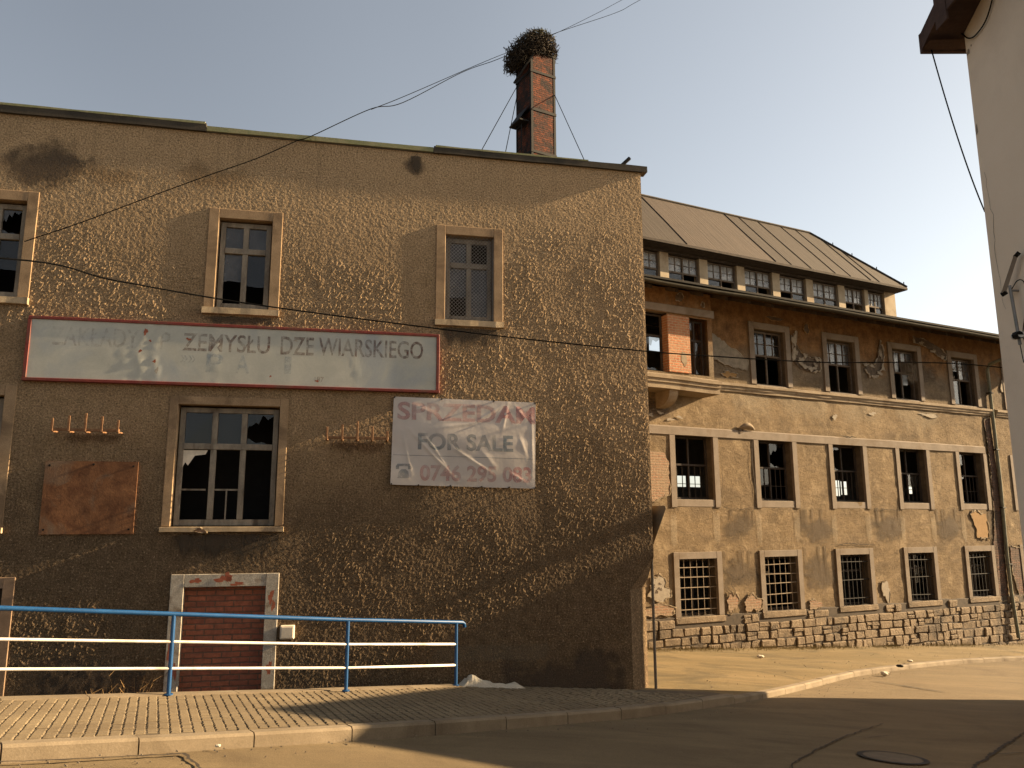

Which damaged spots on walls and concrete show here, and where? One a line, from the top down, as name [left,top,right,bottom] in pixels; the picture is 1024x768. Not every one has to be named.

water stain [7,146,85,186]
water stain [407,156,422,173]
flaking render [791,330,822,373]
flaking render [650,451,671,503]
flaking render [970,417,1024,602]
spalling [646,573,677,618]
flaking render [727,590,764,615]
spalling [881,580,891,604]